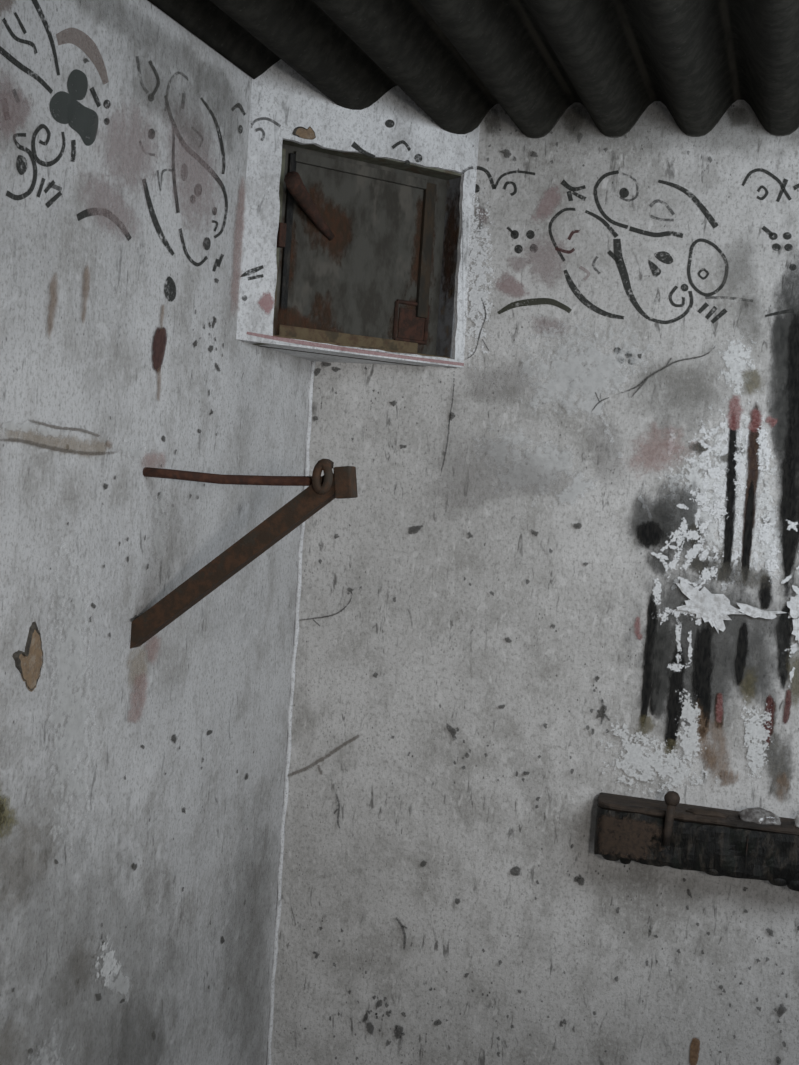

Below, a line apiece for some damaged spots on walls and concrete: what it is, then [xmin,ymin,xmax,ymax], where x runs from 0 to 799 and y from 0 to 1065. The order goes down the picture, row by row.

corrosion [280,171,352,282]
corrosion [411,196,459,297]
spalling [193,316,224,371]
corrosion [273,294,342,333]
peeling [638,336,799,686]
peeling [12,547,96,844]
spalling [447,724,471,770]
peeling [586,689,717,796]
peeling [741,701,772,778]
peeling [77,923,129,1003]
spalling [348,990,406,1046]
spalling [774,994,787,1065]